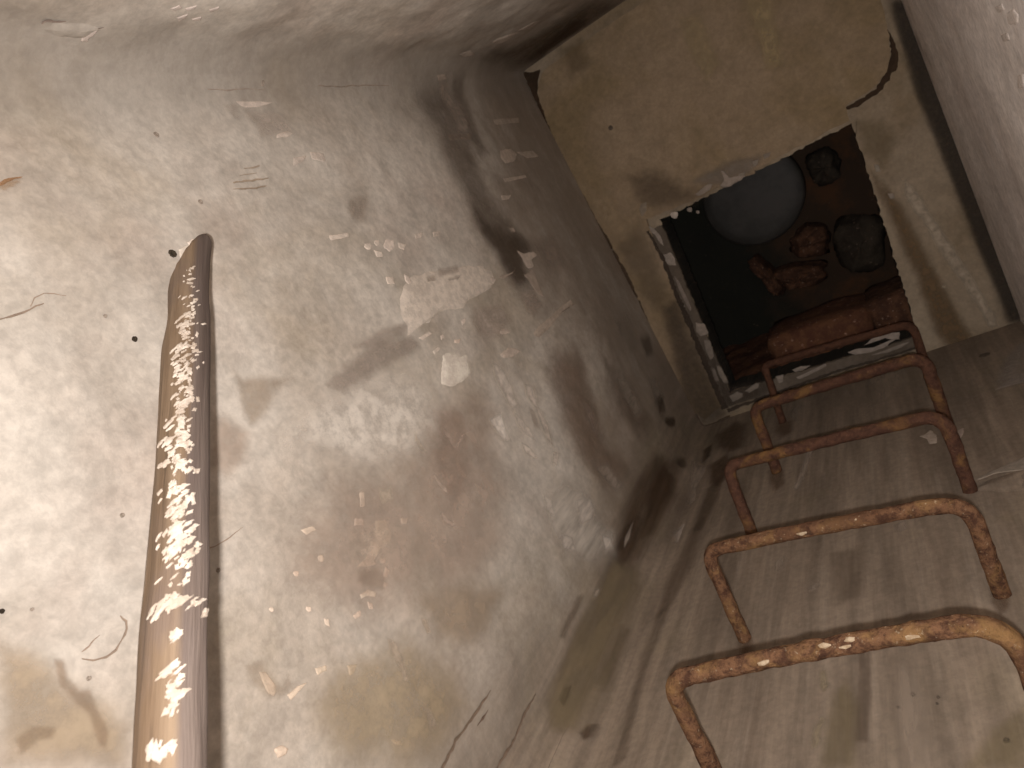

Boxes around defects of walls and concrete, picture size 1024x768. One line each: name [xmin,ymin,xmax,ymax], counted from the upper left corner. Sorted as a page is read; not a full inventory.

spalling [386,243,560,387]
peeling [147,266,209,623]
peeling [353,491,391,619]
peeling [169,627,184,644]
peeling [155,657,191,718]
spalling [259,672,306,700]
peeling [145,737,178,765]
crack [441,690,491,768]
crack [497,694,536,768]